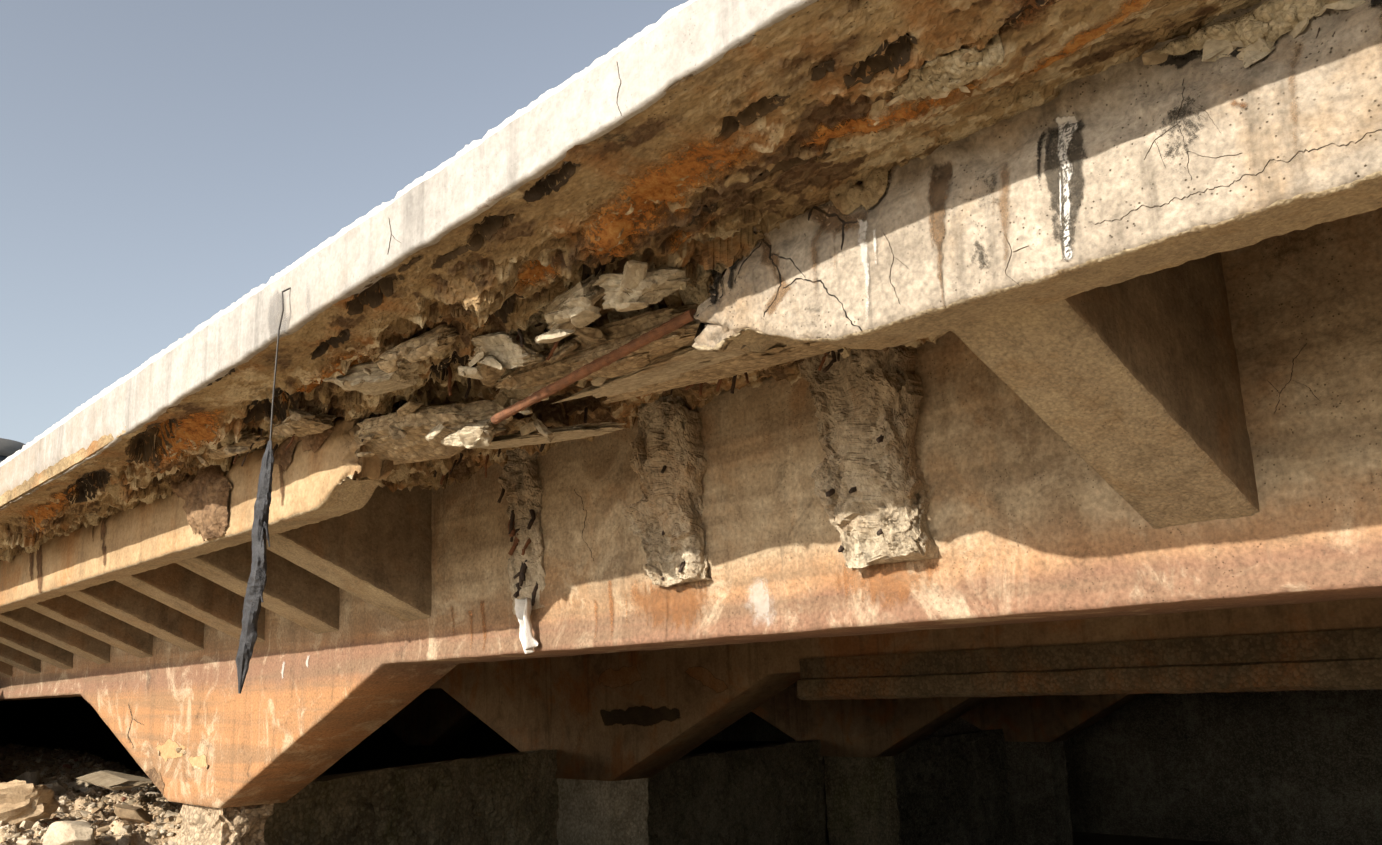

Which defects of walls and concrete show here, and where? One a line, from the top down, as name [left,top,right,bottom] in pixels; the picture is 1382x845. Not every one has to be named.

spalling [811,0,1047,106]
corrosion [1029,0,1152,73]
peeling [1142,0,1366,68]
corrosion [581,137,754,258]
crack [734,230,862,331]
crack [806,206,910,304]
corrosion [803,81,983,153]
water stain [928,161,952,297]
water stain [1037,116,1086,261]
water stain [1159,93,1208,170]
crack [1092,79,1382,225]
spalling [322,255,844,485]